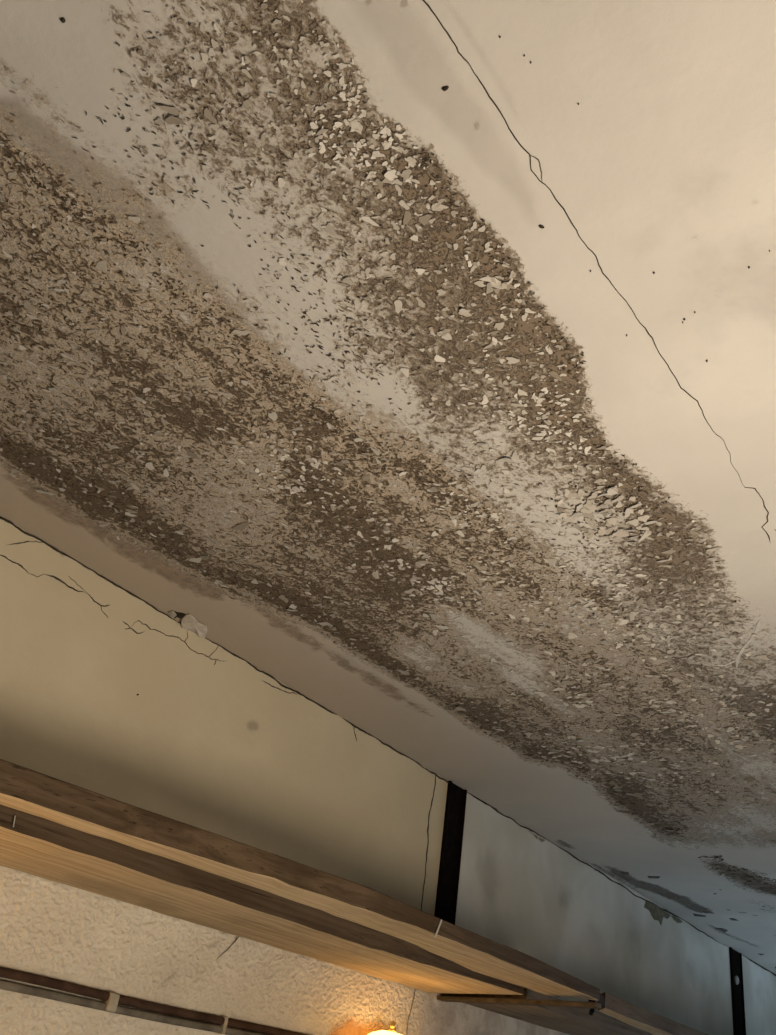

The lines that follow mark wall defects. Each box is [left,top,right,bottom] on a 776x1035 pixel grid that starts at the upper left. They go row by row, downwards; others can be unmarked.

peeling [112,0,141,38]
peeling [154,139,192,168]
peeling [132,167,204,205]
peeling [275,246,315,276]
crack [422,0,776,541]
spalling [168,610,207,637]
crack [0,516,776,976]
peeling [699,855,776,896]
peeling [593,864,764,955]